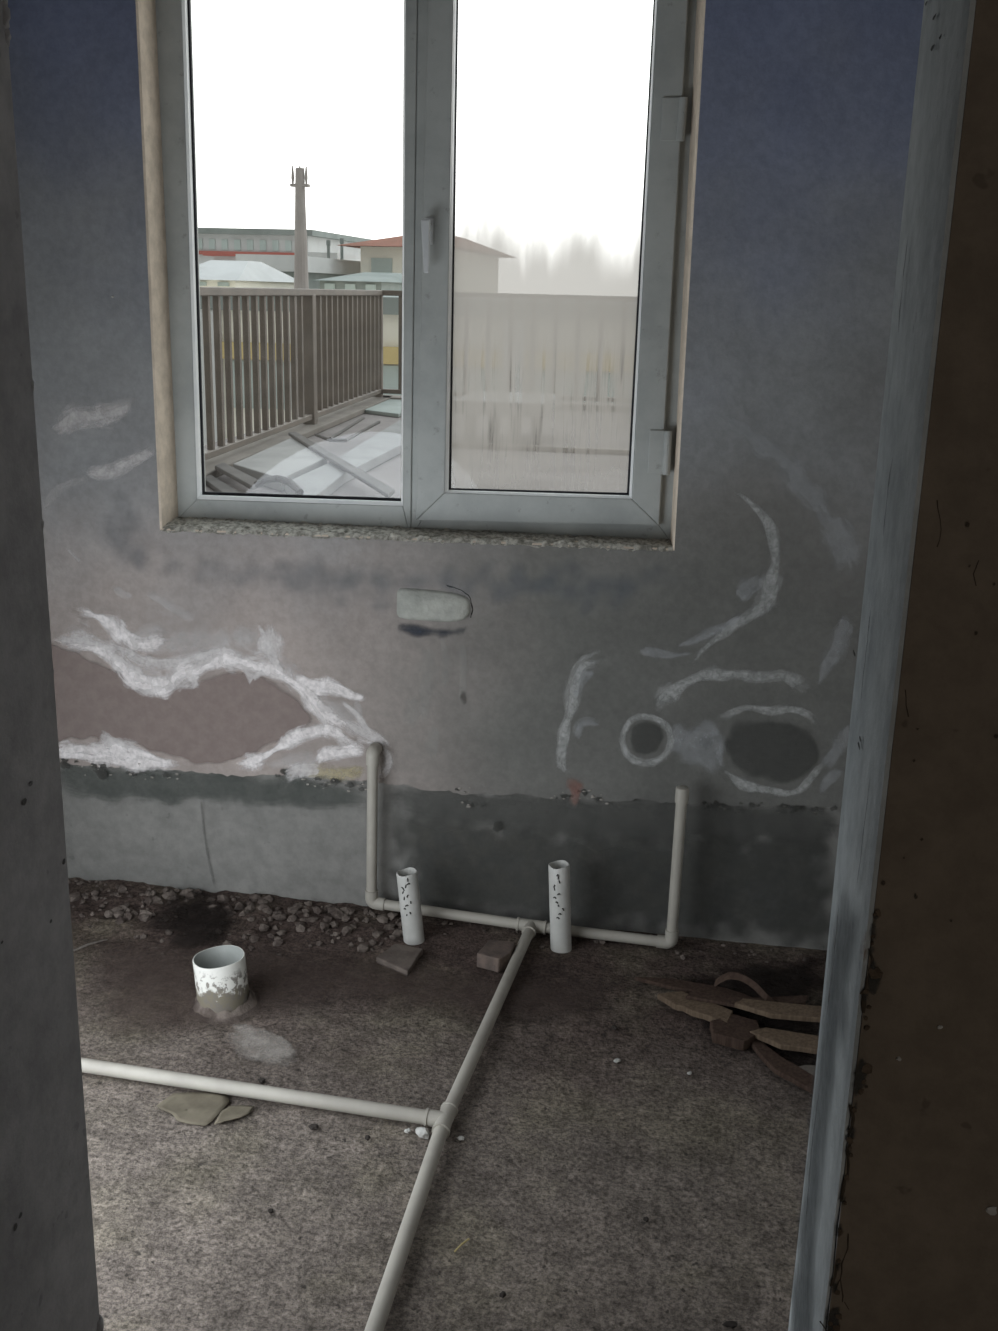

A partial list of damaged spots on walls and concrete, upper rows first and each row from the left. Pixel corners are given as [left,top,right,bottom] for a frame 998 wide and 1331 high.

water stain [701,497,779,653]
spalling [60,758,179,780]